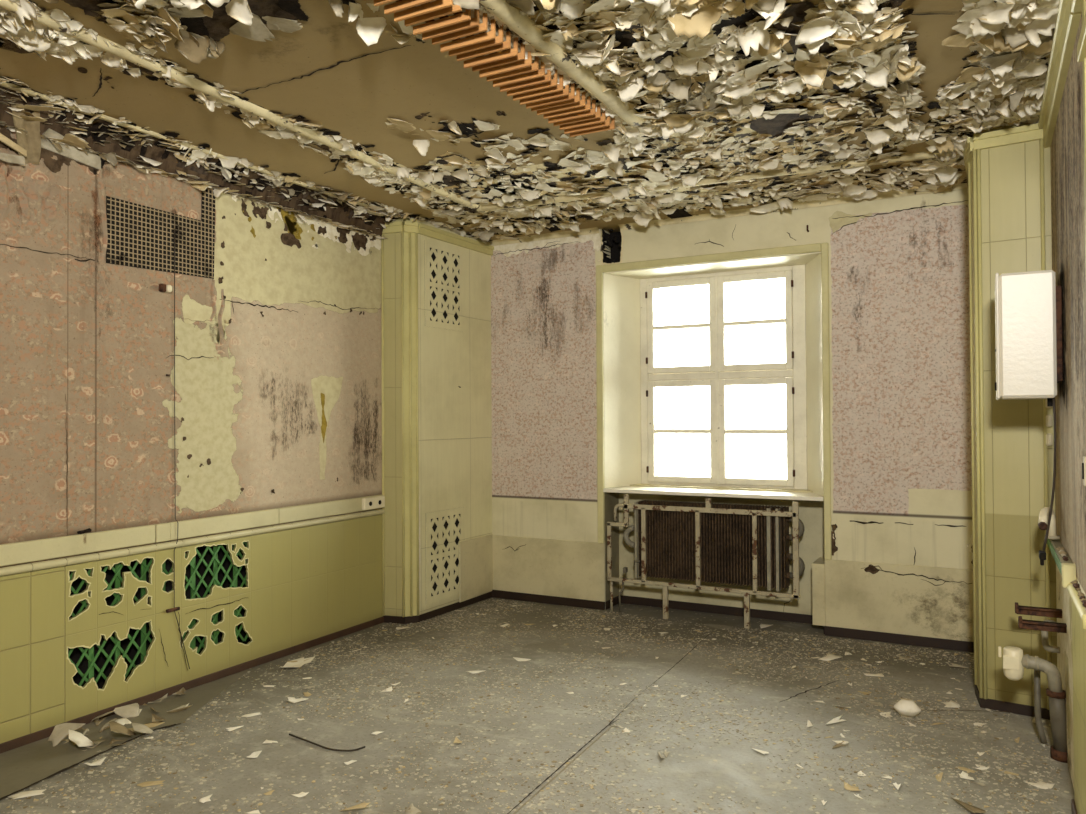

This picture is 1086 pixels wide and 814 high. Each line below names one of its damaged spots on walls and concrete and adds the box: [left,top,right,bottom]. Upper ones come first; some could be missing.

crack [0,244,95,262]
peeling [0,0,1060,514]
crack [62,394,70,527]
spalling [68,540,250,621]
crack [850,520,972,586]
spalling [67,620,156,691]